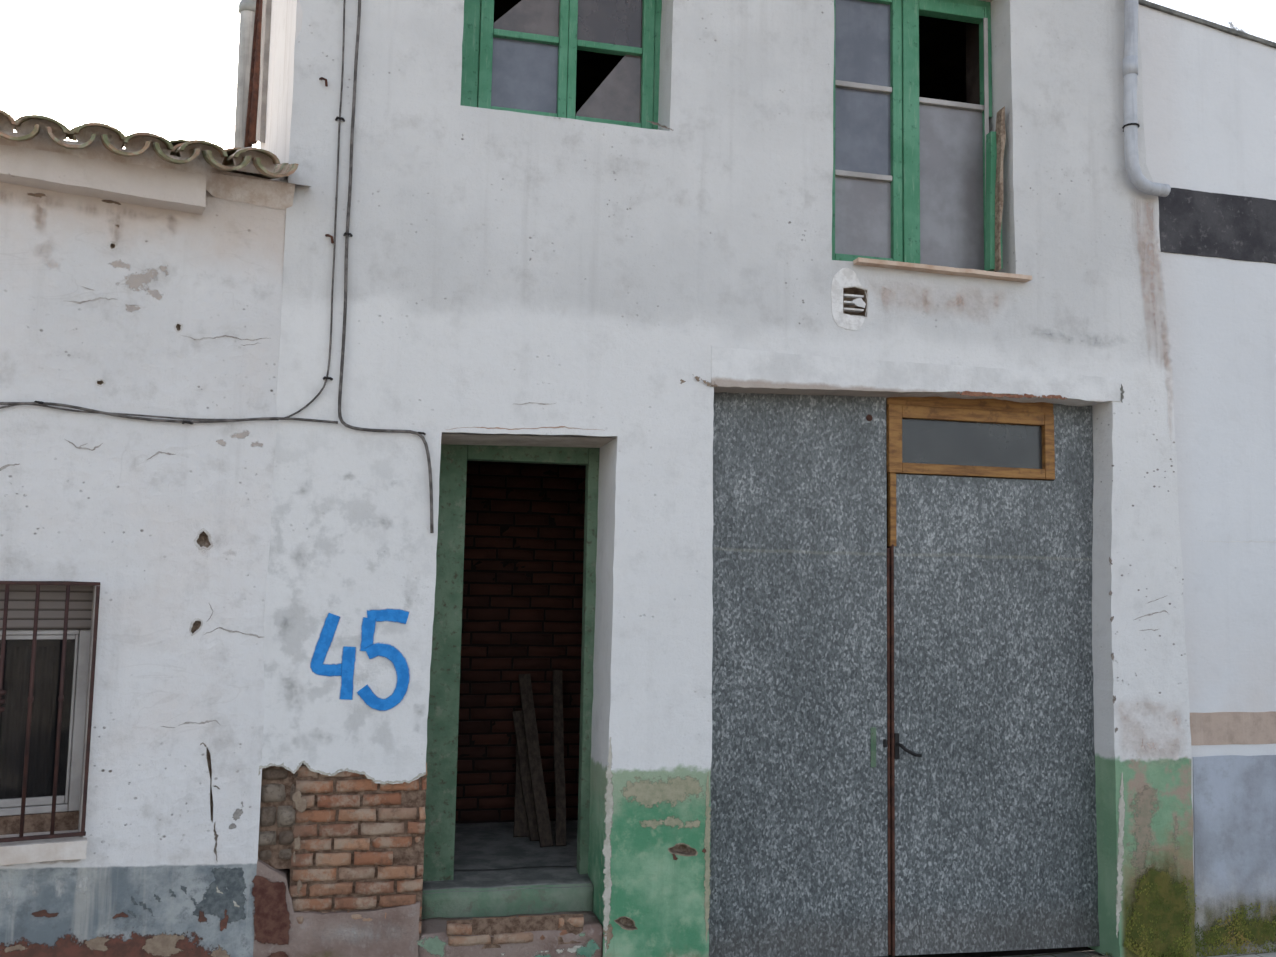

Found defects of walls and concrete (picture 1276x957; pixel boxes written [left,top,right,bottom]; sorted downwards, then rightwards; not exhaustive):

spalling [194,528,213,550]
crack [204,604,263,638]
peeling [229,802,243,829]
peeling [621,775,706,860]
crack [212,823,220,862]
spalling [258,761,637,957]
peeling [0,867,247,957]